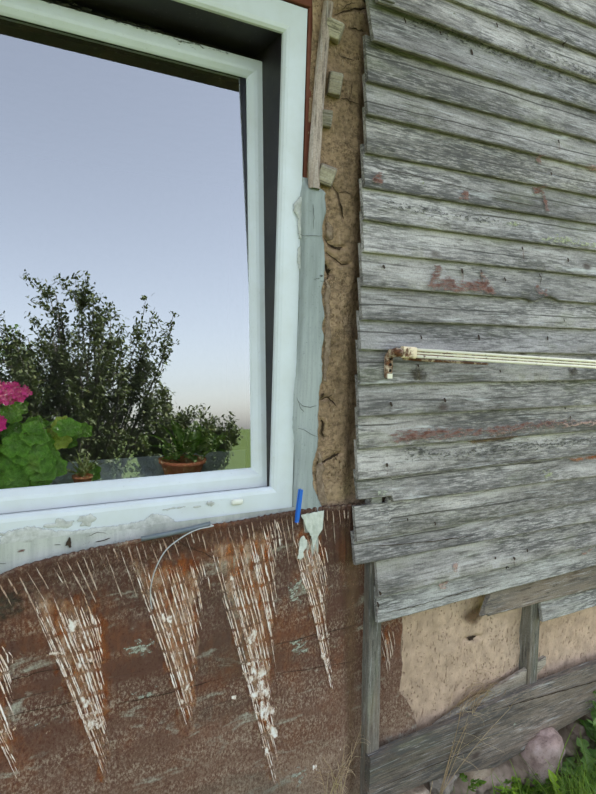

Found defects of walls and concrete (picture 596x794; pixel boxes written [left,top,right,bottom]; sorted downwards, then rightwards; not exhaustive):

crack [335,3,366,32]
peeling [0,569,52,623]
peeling [43,514,96,528]
peeling [54,533,207,605]
corrosion [133,520,282,782]
peeling [215,510,349,566]
corrosion [292,531,336,700]
corrosion [0,647,18,779]
corrosion [35,595,109,781]